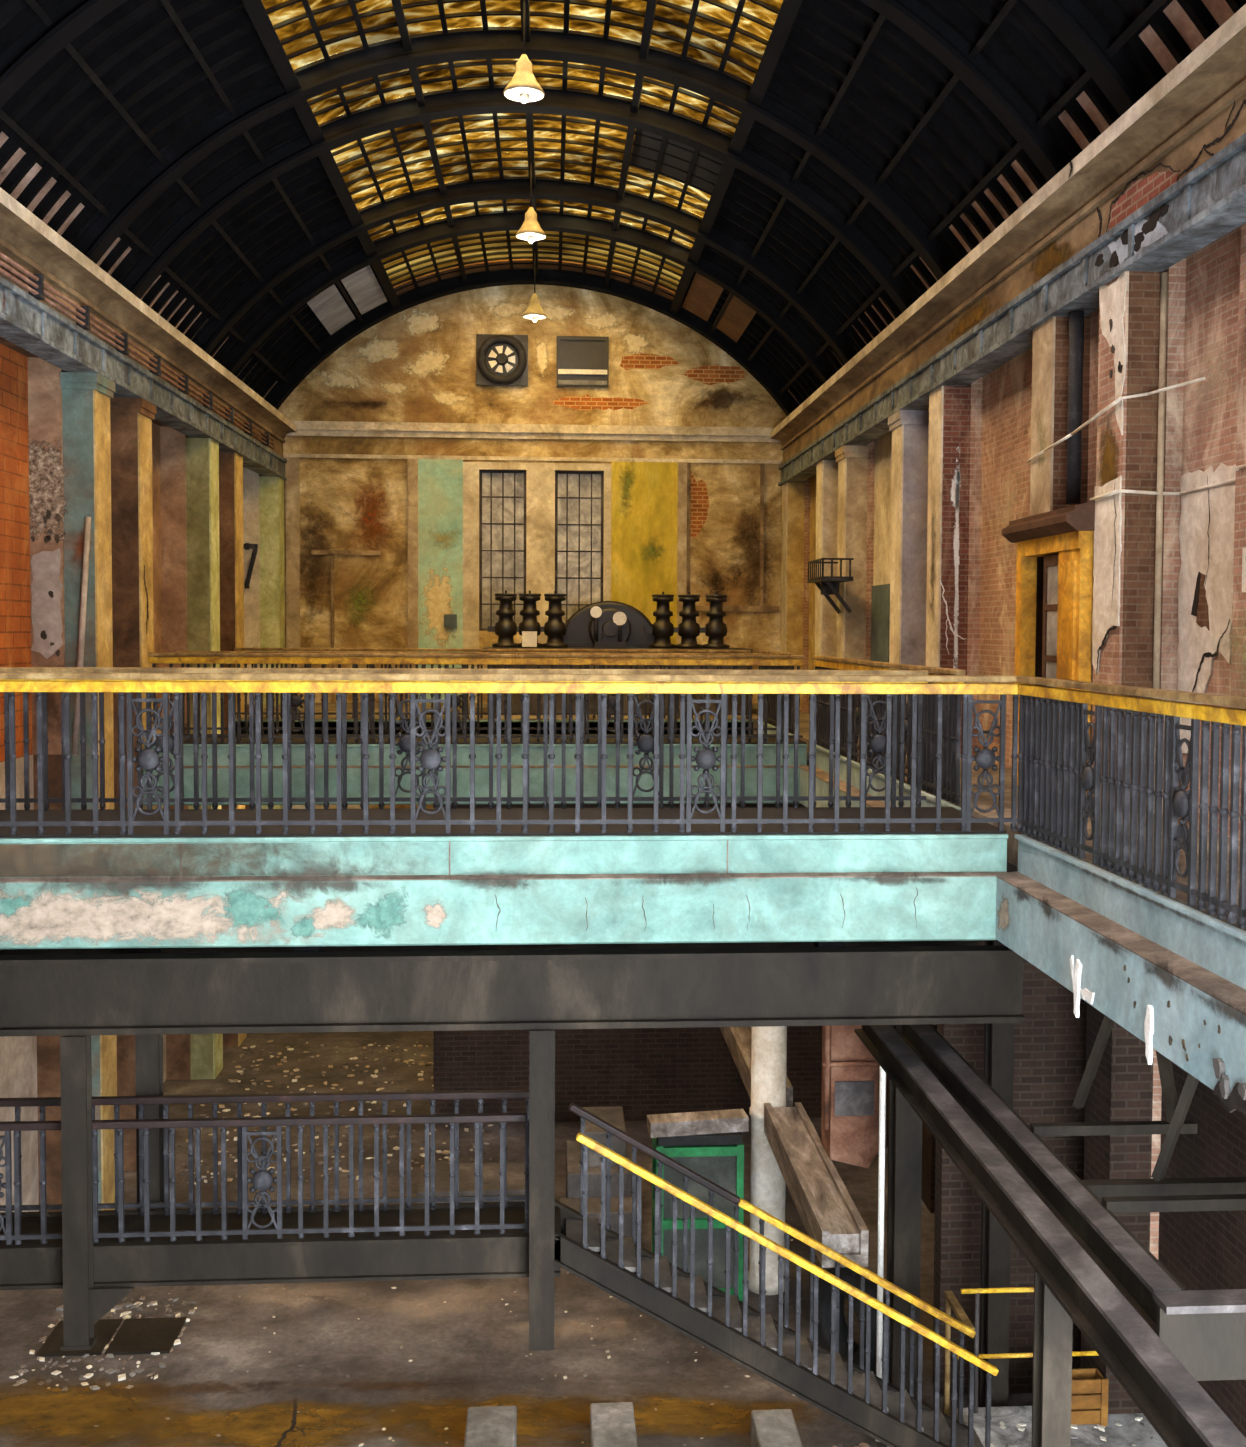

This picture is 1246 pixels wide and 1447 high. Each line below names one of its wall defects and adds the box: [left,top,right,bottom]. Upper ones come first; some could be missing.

peeling [1095,163,1180,435]
water stain [300,509,331,613]
peeling [1176,463,1236,754]
peeling [0,889,292,946]
peeling [306,899,355,937]
peeling [424,902,446,928]
spalling [1212,1058,1246,1116]